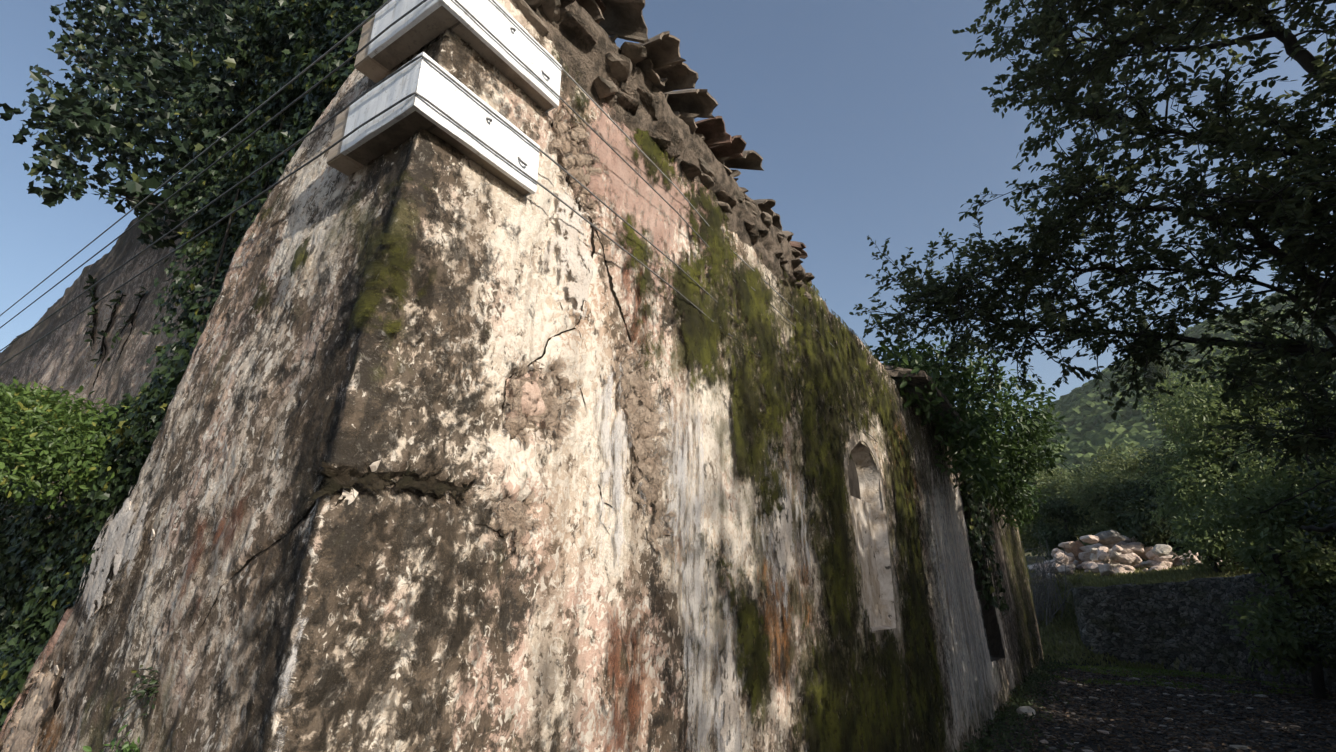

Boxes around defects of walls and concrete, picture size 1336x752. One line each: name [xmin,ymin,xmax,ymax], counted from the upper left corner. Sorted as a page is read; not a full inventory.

crack [502,168,631,422]
crack [201,466,458,626]
leakage [224,149,495,752]
crack [475,524,506,540]
leakage [657,399,810,752]
leakage [532,711,581,752]